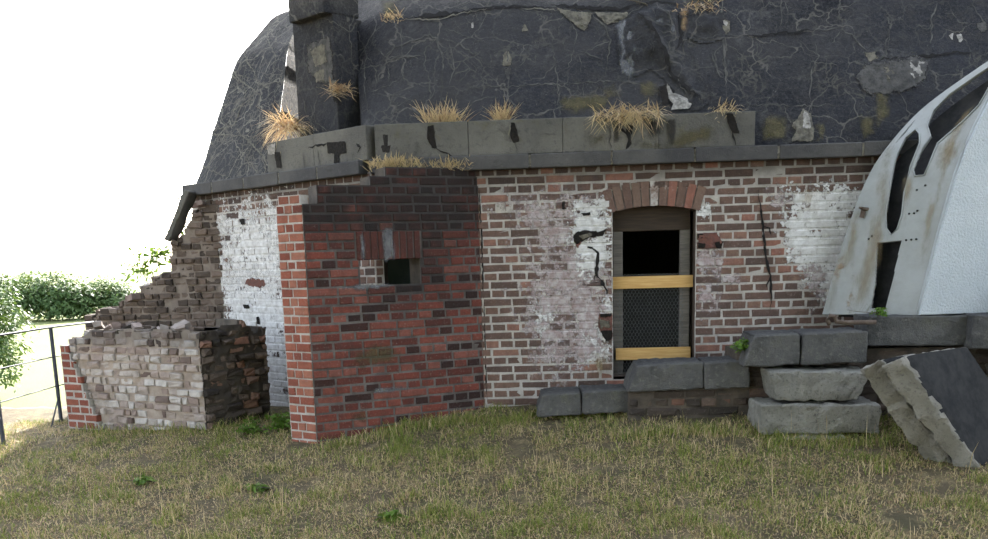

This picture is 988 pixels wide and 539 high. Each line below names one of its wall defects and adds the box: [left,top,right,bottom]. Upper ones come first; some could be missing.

crack [202,22,276,179]
spalling [308,141,346,163]
crack [357,0,680,152]
spalling [658,84,692,110]
crack [692,0,971,142]
crack [587,246,608,295]